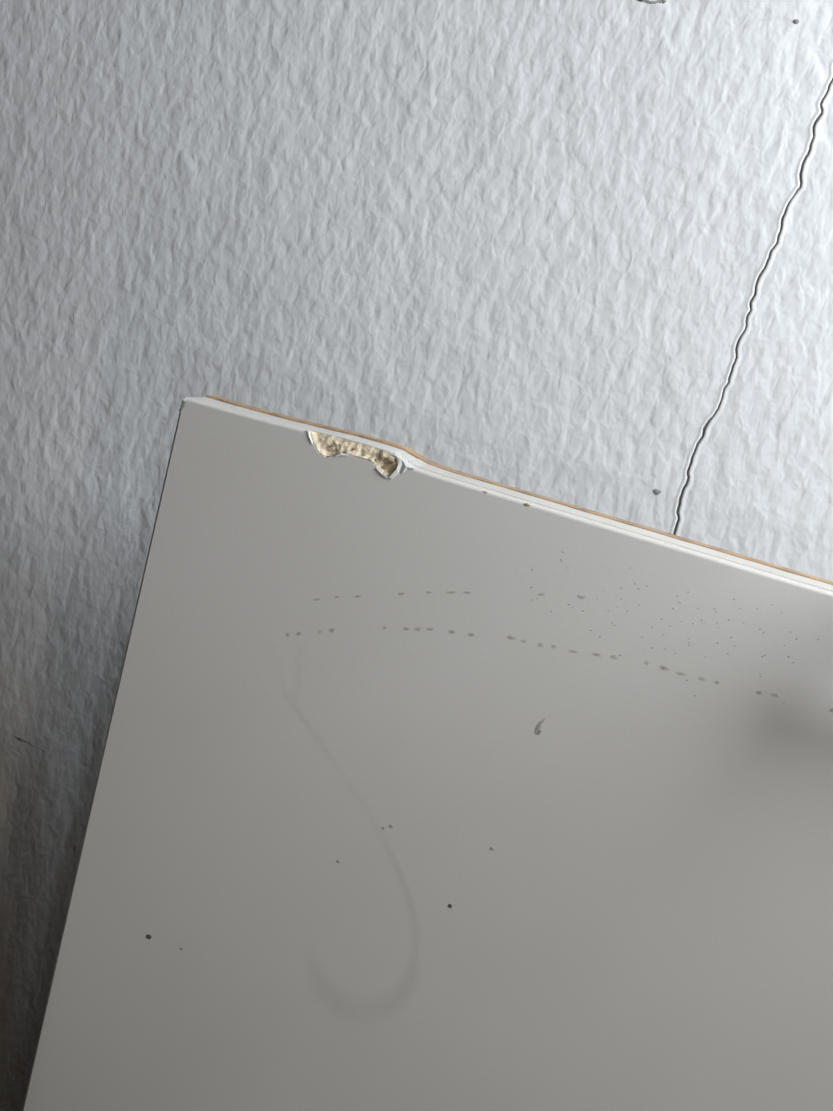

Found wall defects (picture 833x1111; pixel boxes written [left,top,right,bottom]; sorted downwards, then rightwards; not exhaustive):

spalling [306,430,415,479]
crack [669,59,833,536]